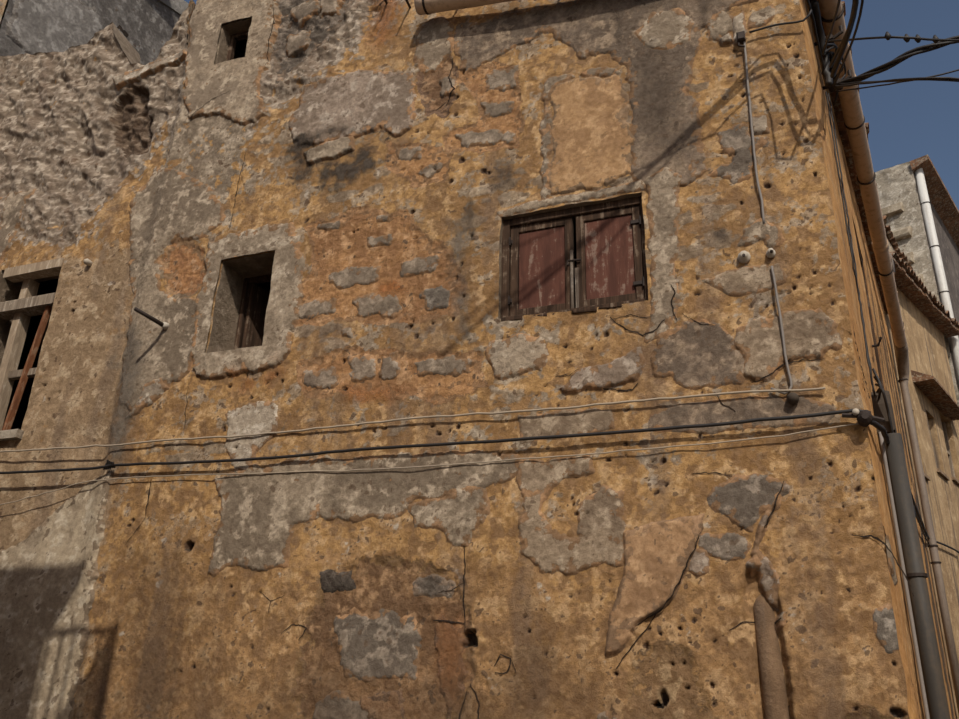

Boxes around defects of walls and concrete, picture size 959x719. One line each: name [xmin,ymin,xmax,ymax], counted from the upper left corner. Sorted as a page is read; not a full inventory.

flaking render [109,84,153,158]
crack [610,285,714,336]
flaking render [290,555,479,719]
crack [616,532,701,669]